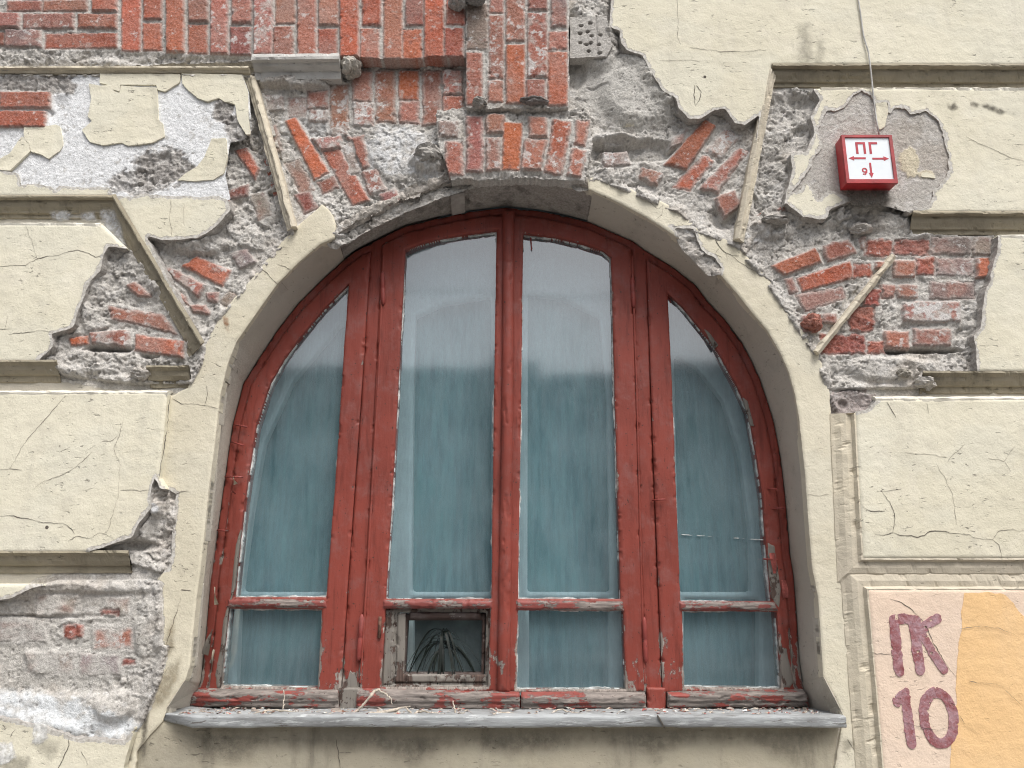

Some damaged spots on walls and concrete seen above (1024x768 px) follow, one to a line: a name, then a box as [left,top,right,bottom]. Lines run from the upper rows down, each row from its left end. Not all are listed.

flaking render [0,0,998,414]
crack [7,386,218,539]
crack [863,444,1023,552]
flaking render [0,479,177,741]
peeling [767,543,788,607]